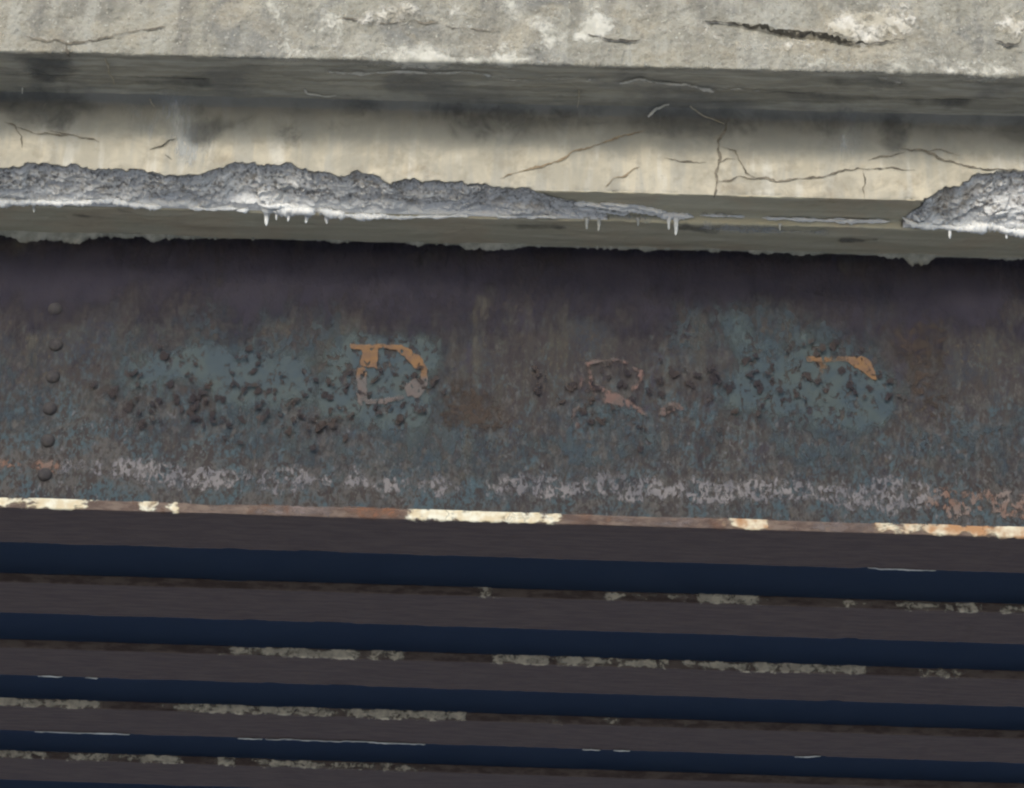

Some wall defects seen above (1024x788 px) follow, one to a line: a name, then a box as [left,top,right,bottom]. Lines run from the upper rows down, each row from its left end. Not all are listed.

crack [705,20,905,45]
damp [885,56,1014,83]
crack [500,131,642,179]
crack [668,121,1020,197]
damp [0,198,162,211]
damp [188,203,469,222]
damp [902,210,1024,239]
corrosion [113,344,447,450]
corrosion [645,353,829,416]
peeling [0,457,561,525]
corrosion [344,506,397,518]
peeling [487,471,1024,539]